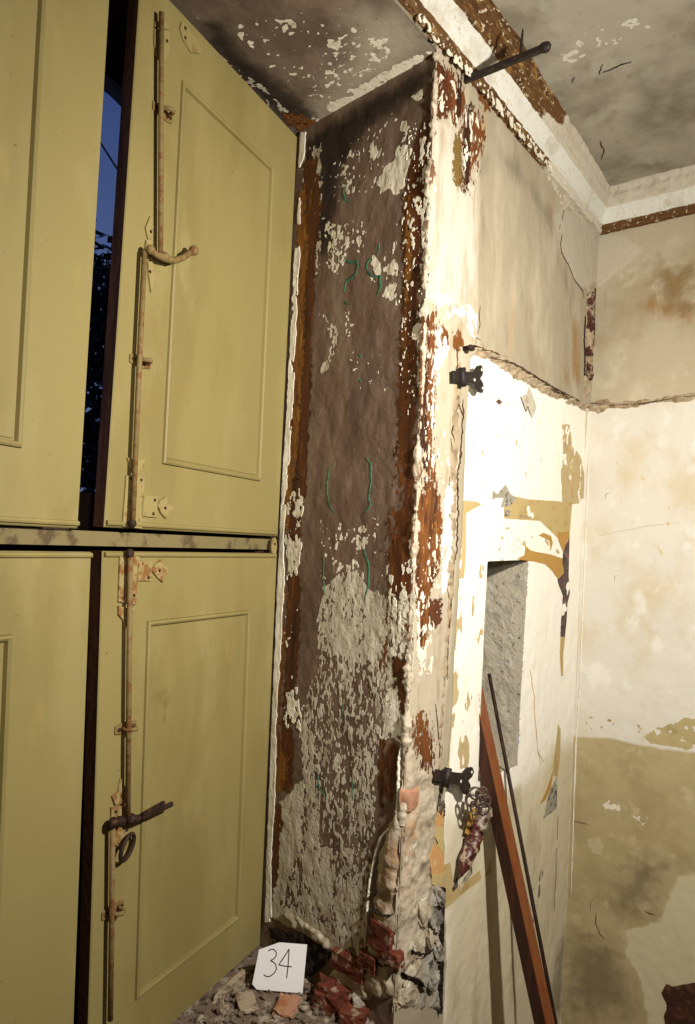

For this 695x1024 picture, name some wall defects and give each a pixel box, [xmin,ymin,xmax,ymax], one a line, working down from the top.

rust [266,157,323,888]
rust [380,60,491,774]
peeling [224,13,695,1015]
crack [559,212,584,297]